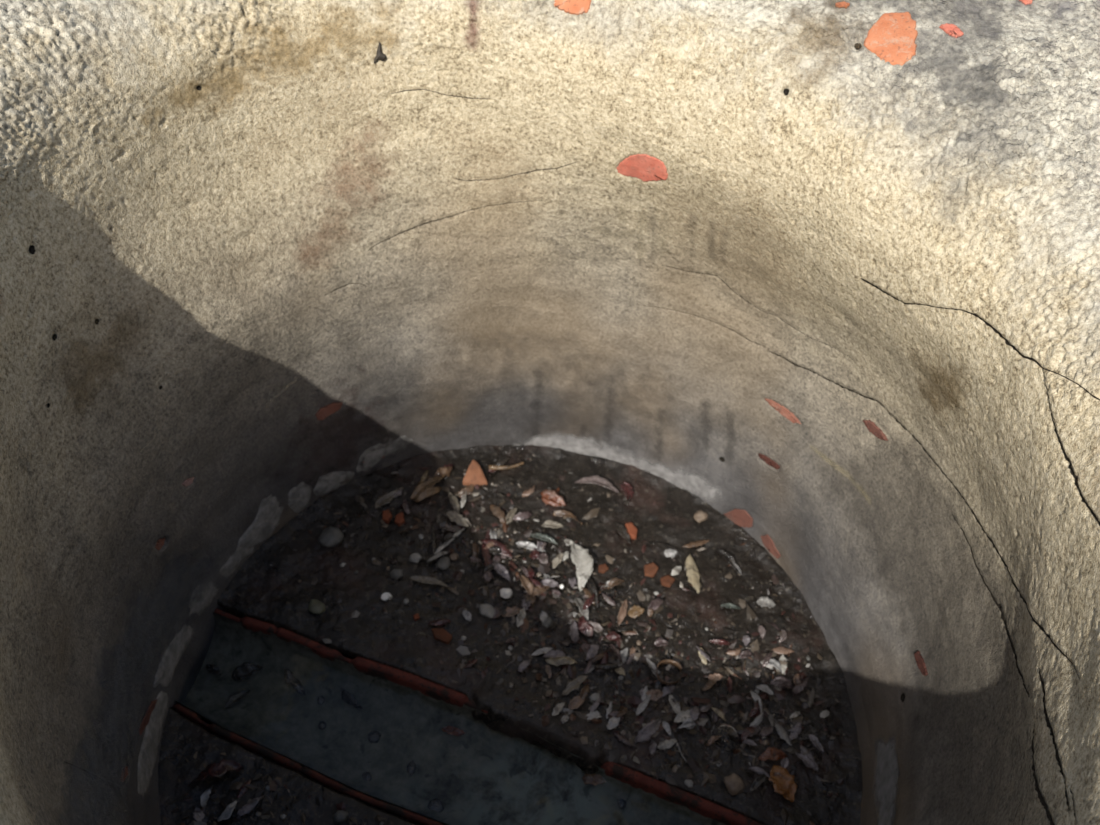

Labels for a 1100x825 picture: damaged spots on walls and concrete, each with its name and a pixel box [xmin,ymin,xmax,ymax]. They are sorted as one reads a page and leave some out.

crack [636,265,1100,825]